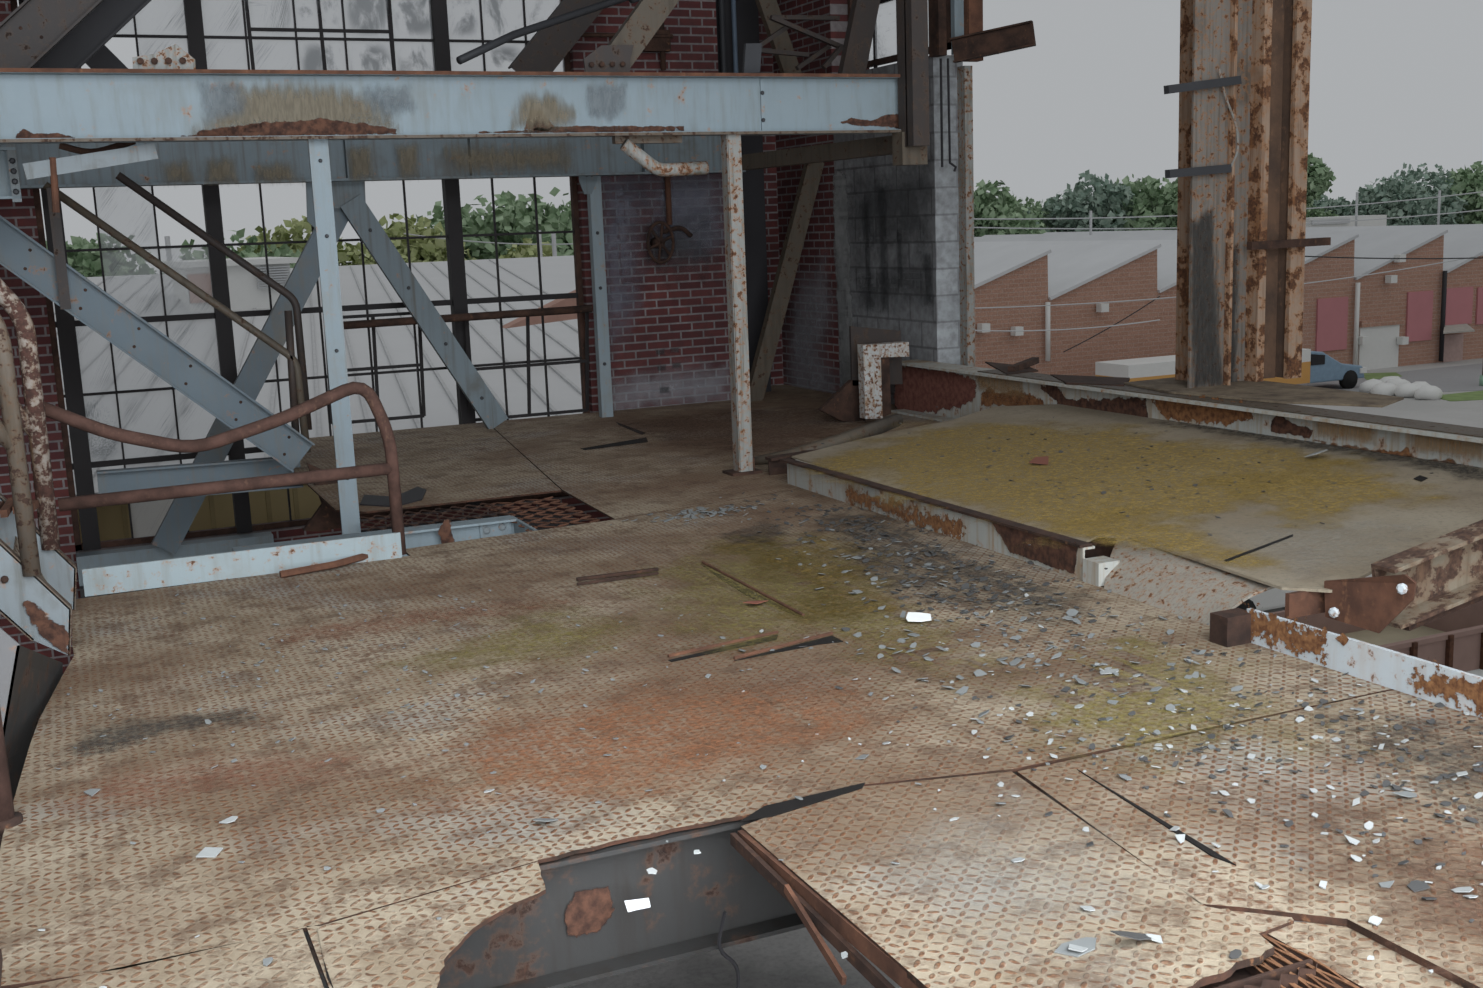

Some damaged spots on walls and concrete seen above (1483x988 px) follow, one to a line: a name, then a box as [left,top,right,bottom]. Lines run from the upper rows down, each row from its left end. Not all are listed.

corrosion [0,68,900,77]
corrosion [845,484,966,541]
corrosion [1241,599,1349,666]
corrosion [1407,660,1483,717]
corrosion [565,886,615,938]
peeling [624,898,650,912]